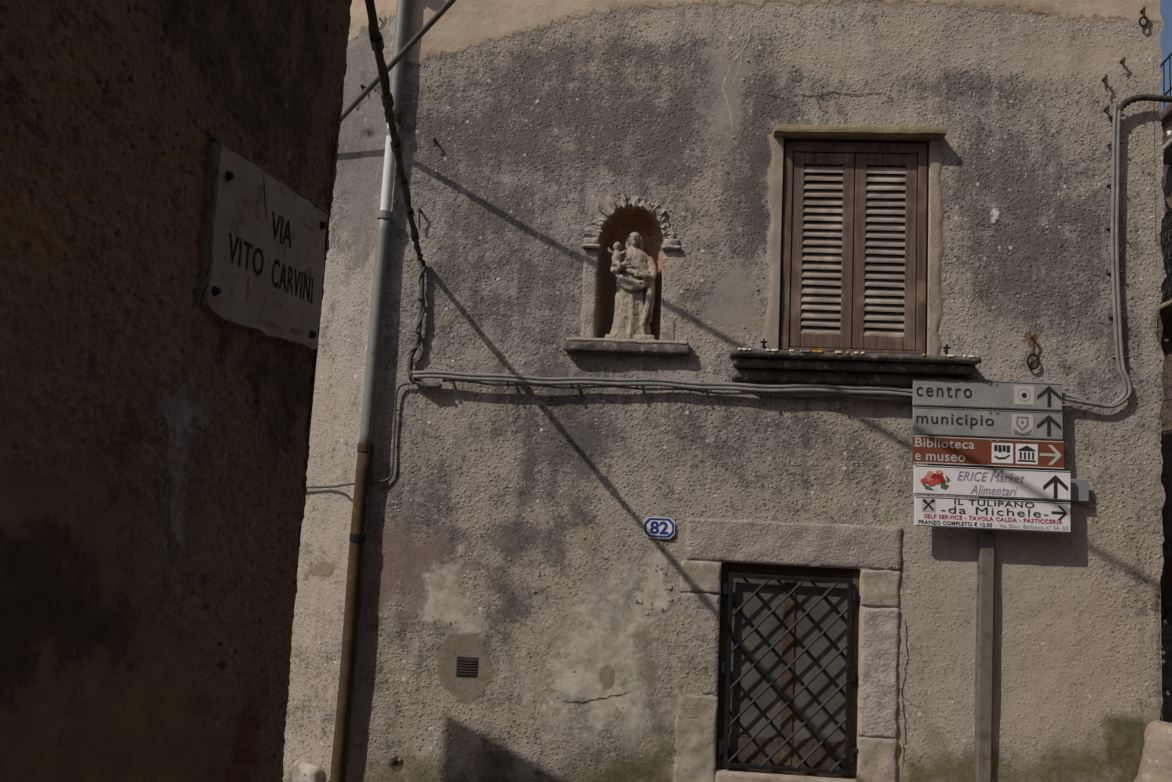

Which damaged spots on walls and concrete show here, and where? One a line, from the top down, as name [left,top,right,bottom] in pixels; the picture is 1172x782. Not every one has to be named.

peeling [697,47,754,153]
crack [722,25,752,131]
crack [768,91,877,112]